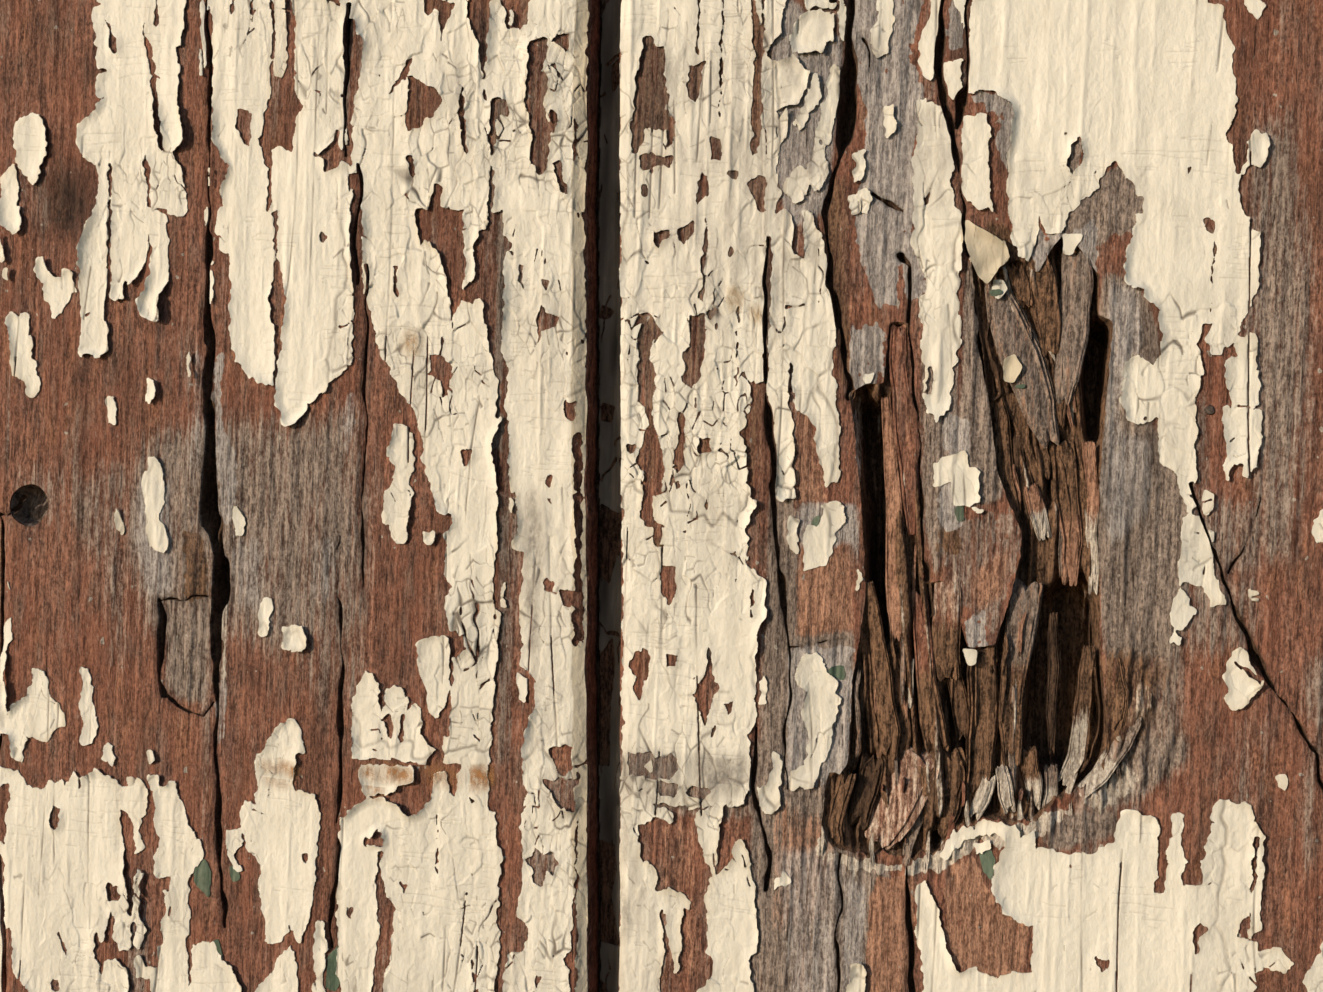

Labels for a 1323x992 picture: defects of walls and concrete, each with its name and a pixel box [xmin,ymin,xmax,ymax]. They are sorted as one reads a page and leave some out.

peeling [5,311,41,398]
peeling [0,112,48,281]
peeling [33,0,188,358]
peeling [0,618,242,992]
peeling [141,456,169,553]
crack [158,24,231,927]
peeling [199,0,590,992]
crack [751,239,827,891]
crack [896,253,934,619]
spalling [599,0,1294,992]
crack [1190,483,1323,791]
peeling [1302,942,1323,992]